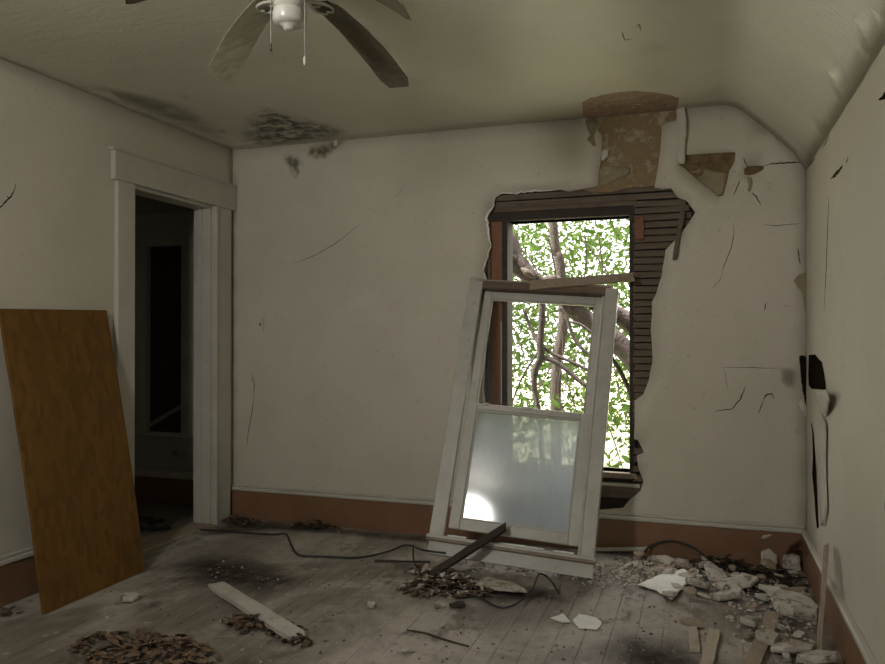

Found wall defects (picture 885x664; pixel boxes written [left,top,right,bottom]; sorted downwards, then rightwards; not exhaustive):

water stain [255,114,334,155]
flaking render [678,152,736,196]
flaking render [744,166,764,192]
crack [734,130,831,226]
flaking render [483,91,692,425]
crack [715,367,781,414]
flaking render [798,355,830,528]
flaking render [633,448,644,495]